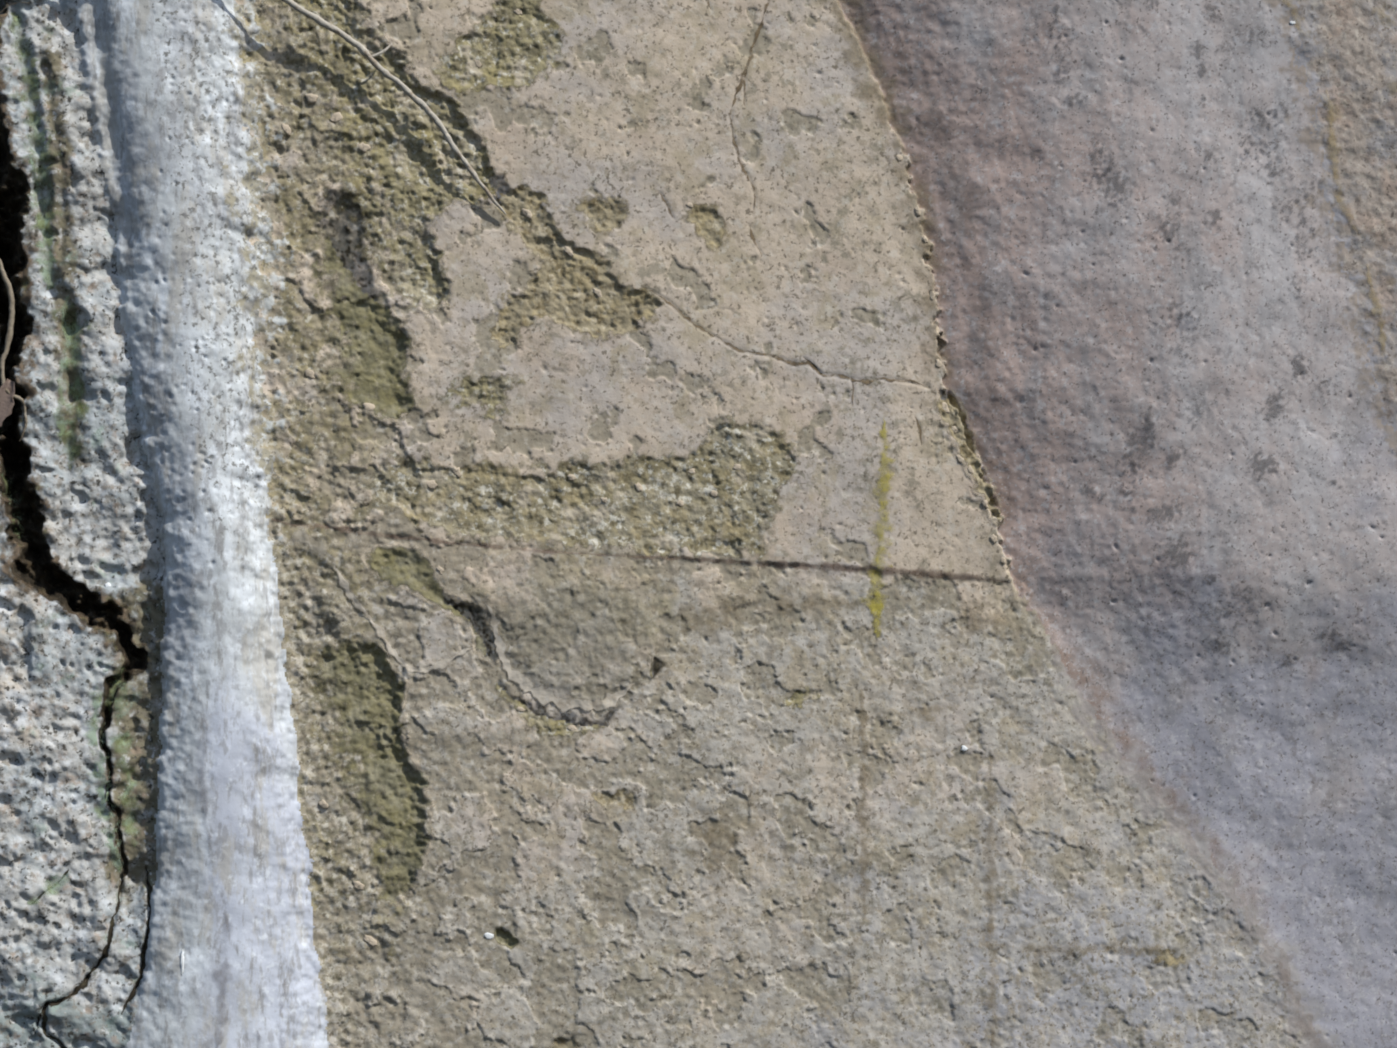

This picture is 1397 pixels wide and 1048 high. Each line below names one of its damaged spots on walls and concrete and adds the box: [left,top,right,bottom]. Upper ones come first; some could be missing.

leakage [12,12,90,469]
spalling [263,0,664,424]
spalling [686,202,730,251]
crack [730,3,769,255]
crack [649,290,926,445]
crack [0,0,152,1048]
spalling [278,415,800,664]
crack [782,562,850,571]
leakage [88,667,137,870]
spalling [496,681,605,737]
spalling [784,686,821,708]